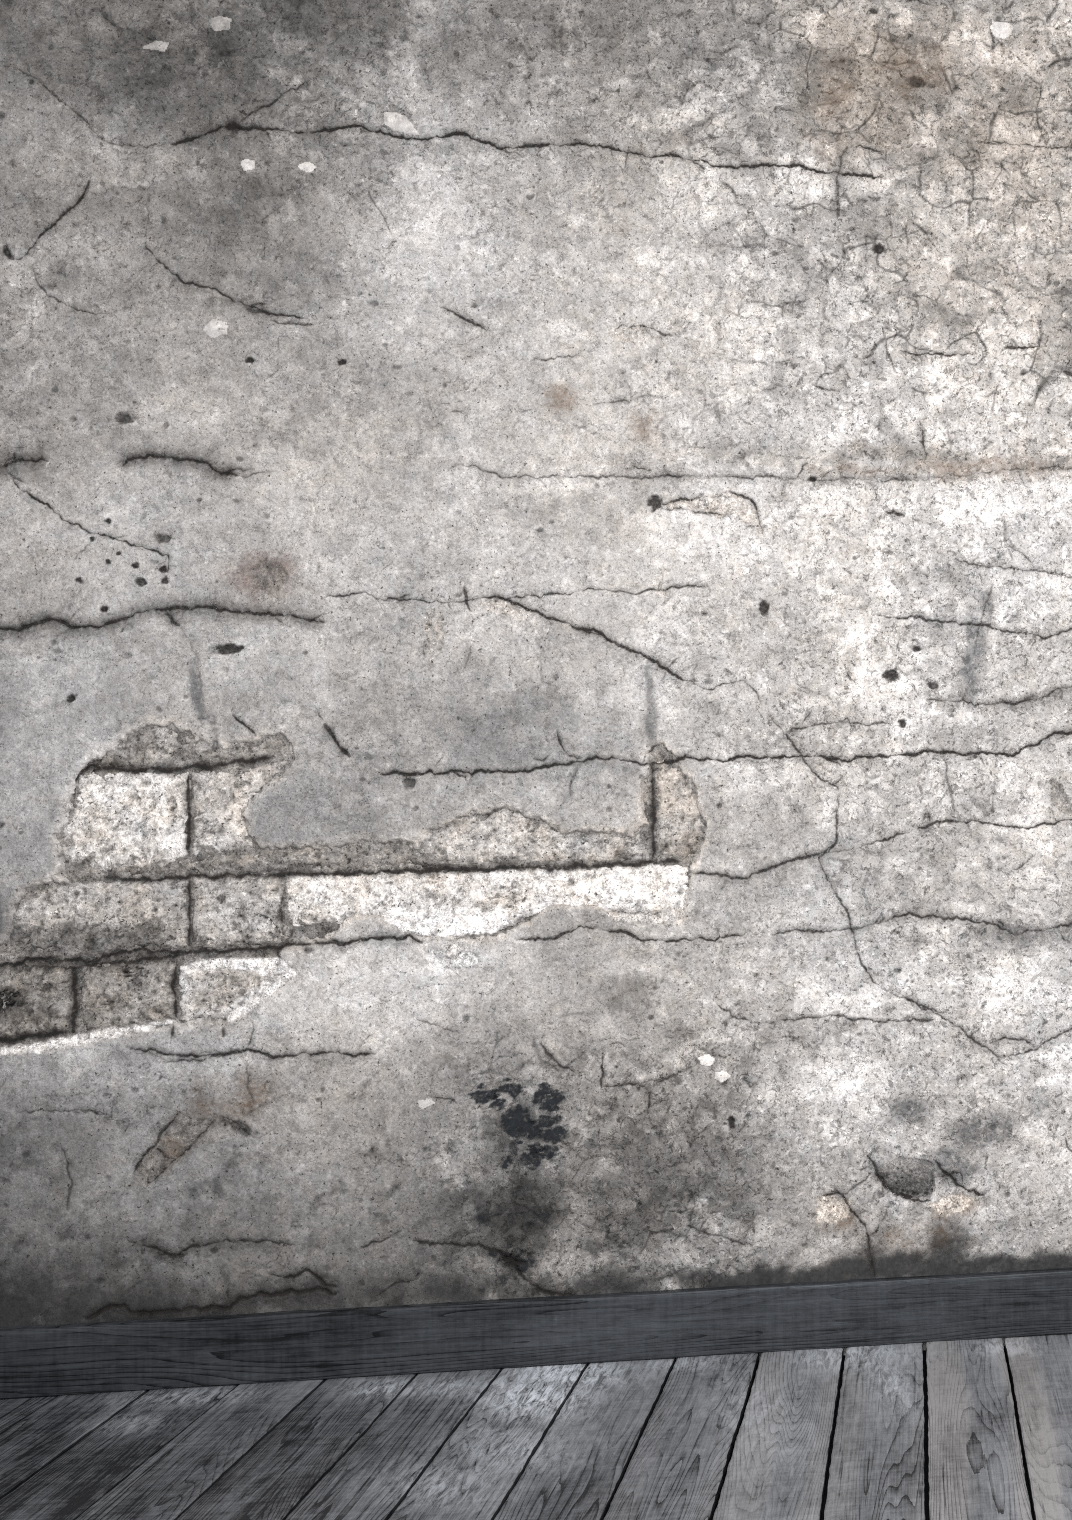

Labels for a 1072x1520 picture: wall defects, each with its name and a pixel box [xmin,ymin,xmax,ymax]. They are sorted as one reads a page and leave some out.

crack [130,84,880,215]
crack [470,463,838,524]
crack [0,453,757,693]
crack [964,553,1072,578]
crack [886,615,1072,640]
spalling [0,723,706,1055]
crack [319,687,1072,1057]
crack [0,915,422,969]
crack [131,1026,370,1062]
damp [468,1078,568,1170]
damp [426,1248,535,1302]
damp [677,1223,1072,1288]